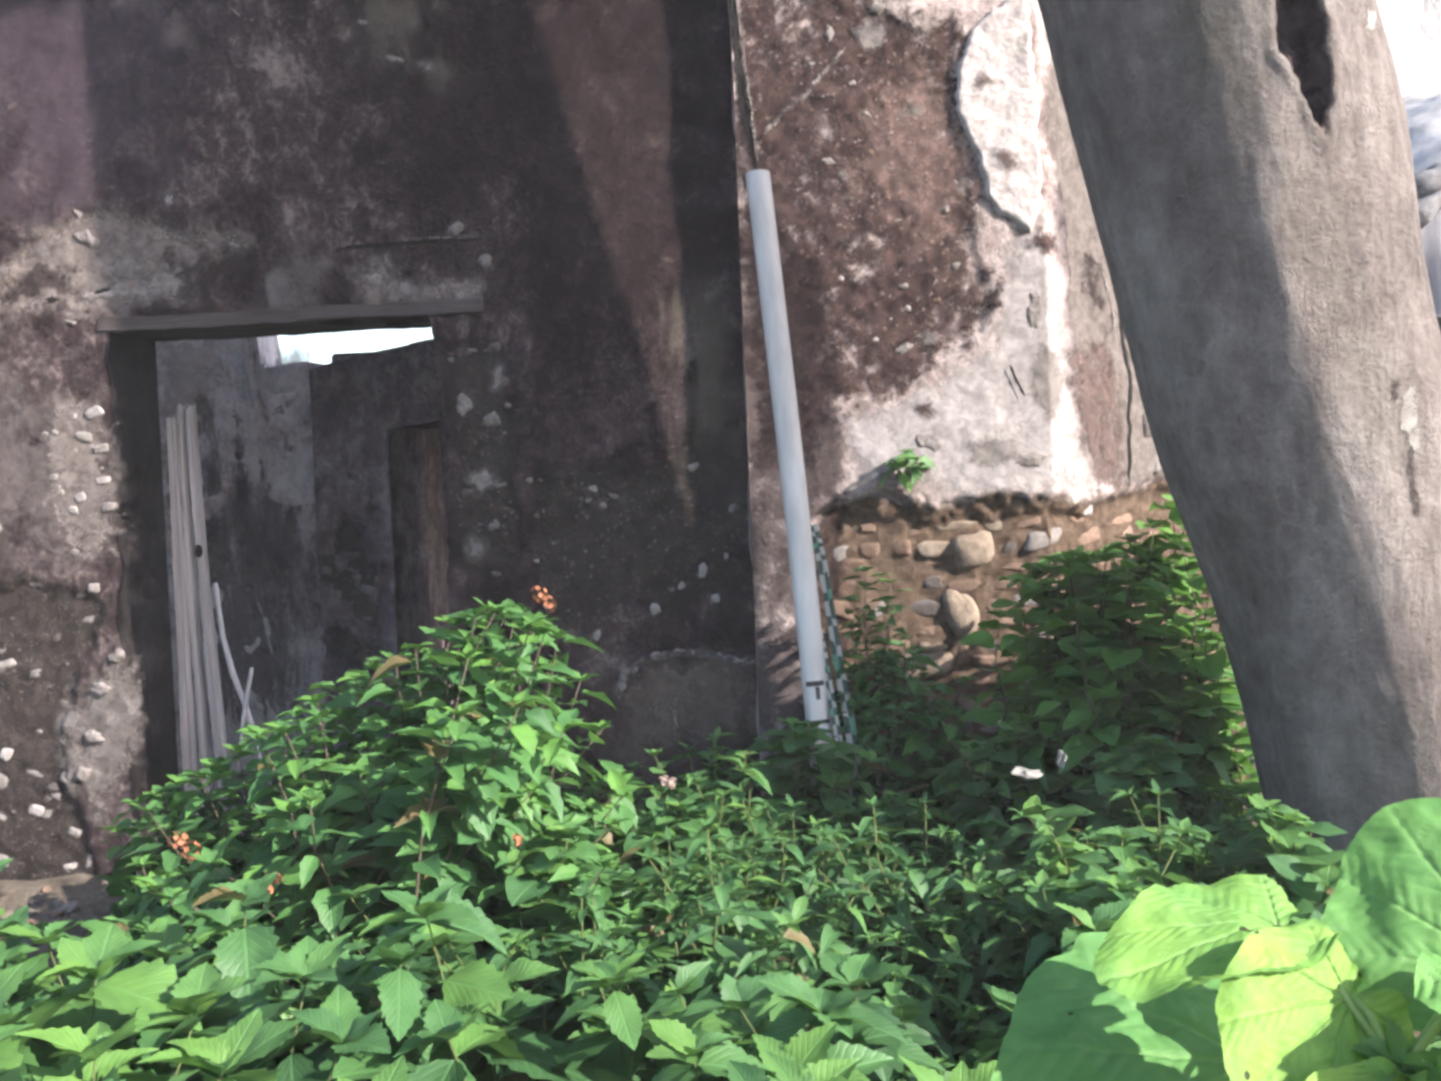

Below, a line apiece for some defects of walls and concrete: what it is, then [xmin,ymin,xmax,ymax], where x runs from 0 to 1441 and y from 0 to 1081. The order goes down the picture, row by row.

peeling [955,0,1056,254]
spalling [0,201,261,325]
damp [227,0,1005,755]
spalling [987,293,1003,312]
crack [1121,323,1133,488]
spalling [0,390,148,880]
damp [166,339,324,751]